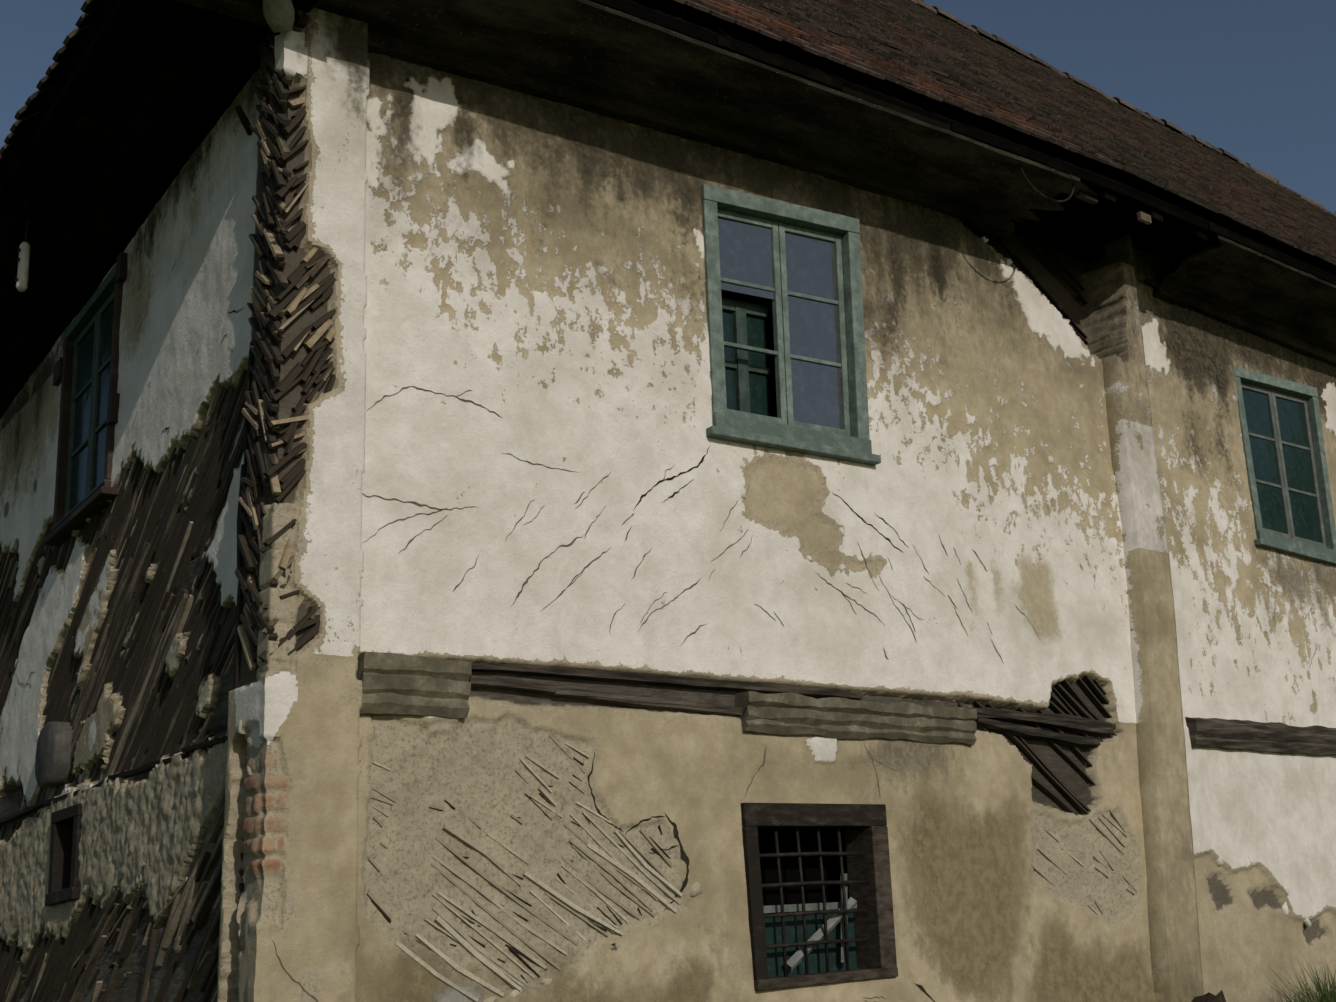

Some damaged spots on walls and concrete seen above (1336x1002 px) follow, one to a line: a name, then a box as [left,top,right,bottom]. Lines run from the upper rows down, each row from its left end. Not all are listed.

water stain [0,316,77,503]
water stain [124,138,210,341]
crack [368,386,501,417]
water stain [311,11,1016,345]
peeling [366,56,1109,585]
water stain [1156,301,1336,420]
flaking render [205,453,244,606]
crack [358,488,476,554]
crack [502,448,753,635]
flaking render [0,538,114,806]
crack [915,983,935,1002]
peeling [1194,848,1336,1002]